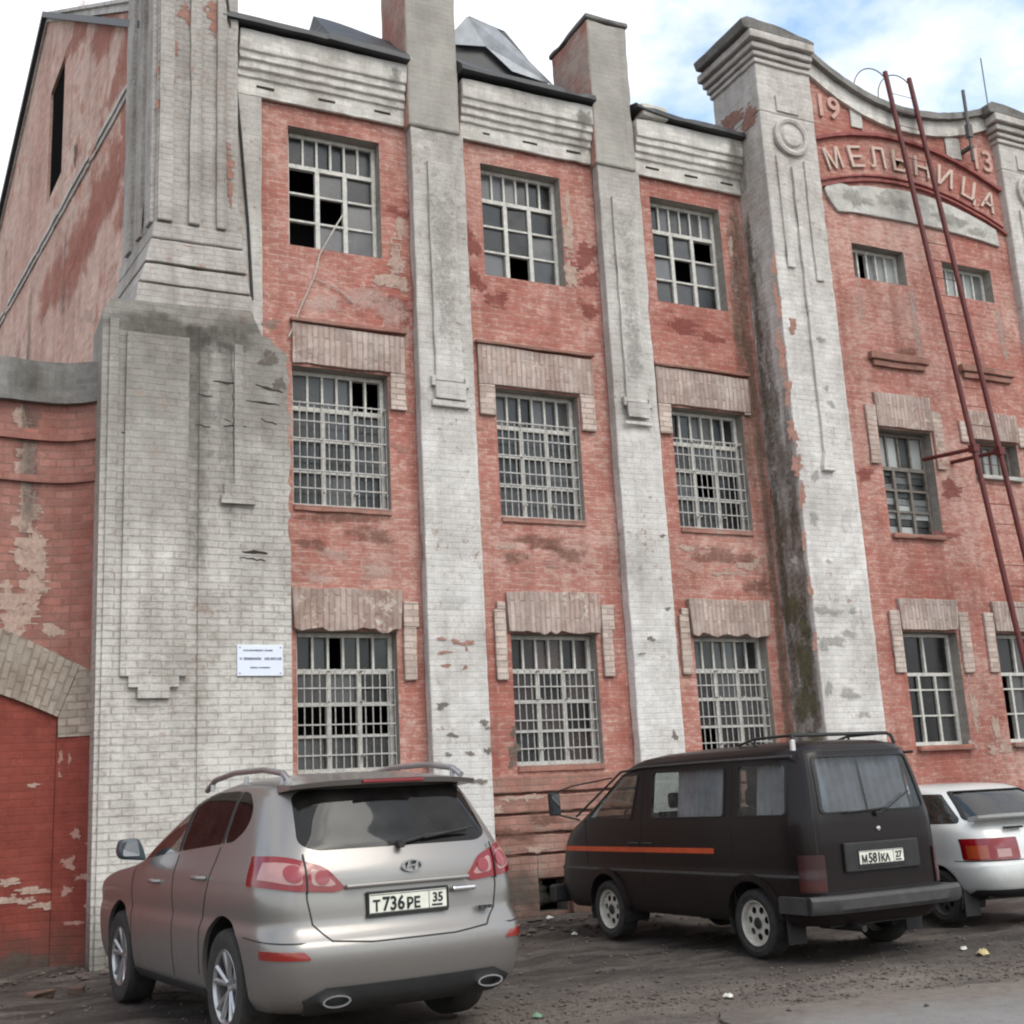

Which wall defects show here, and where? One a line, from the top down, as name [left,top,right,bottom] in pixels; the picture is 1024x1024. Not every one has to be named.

flaking render [370,205,412,334]
peeling [563,182,600,321]
flaking render [11,404,33,428]
flaking render [0,442,67,638]
crack [195,338,283,474]
crack [240,550,267,561]
peeling [770,252,819,523]
leakage [746,222,860,741]
peeling [437,637,475,670]
spalling [0,855,87,910]